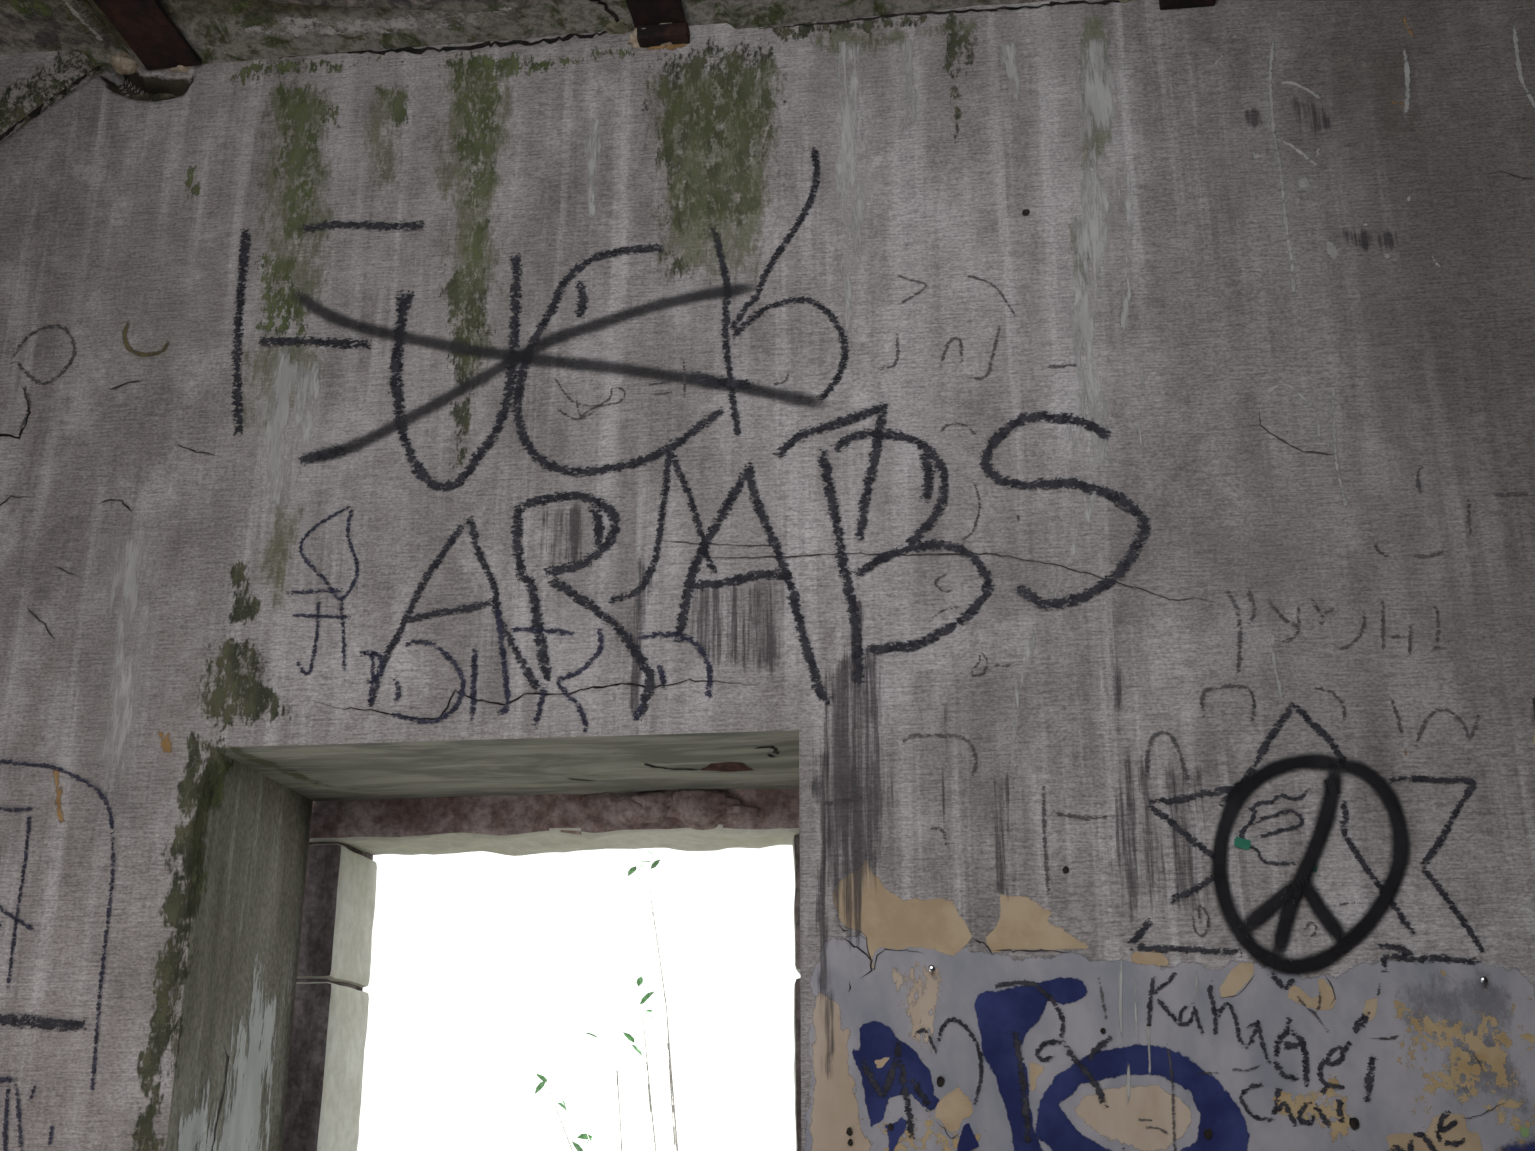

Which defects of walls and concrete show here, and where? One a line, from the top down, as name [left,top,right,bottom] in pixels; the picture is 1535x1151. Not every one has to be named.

crack [0,65,102,140]
water stain [1001,43,1020,101]
water stain [582,118,601,216]
water stain [643,13,978,339]
crack [0,385,31,439]
crack [109,380,141,390]
water stain [449,393,474,468]
crack [99,499,132,512]
crack [27,608,56,640]
water stain [98,527,152,787]
water stain [132,355,320,1151]
peeling [804,859,1535,1151]